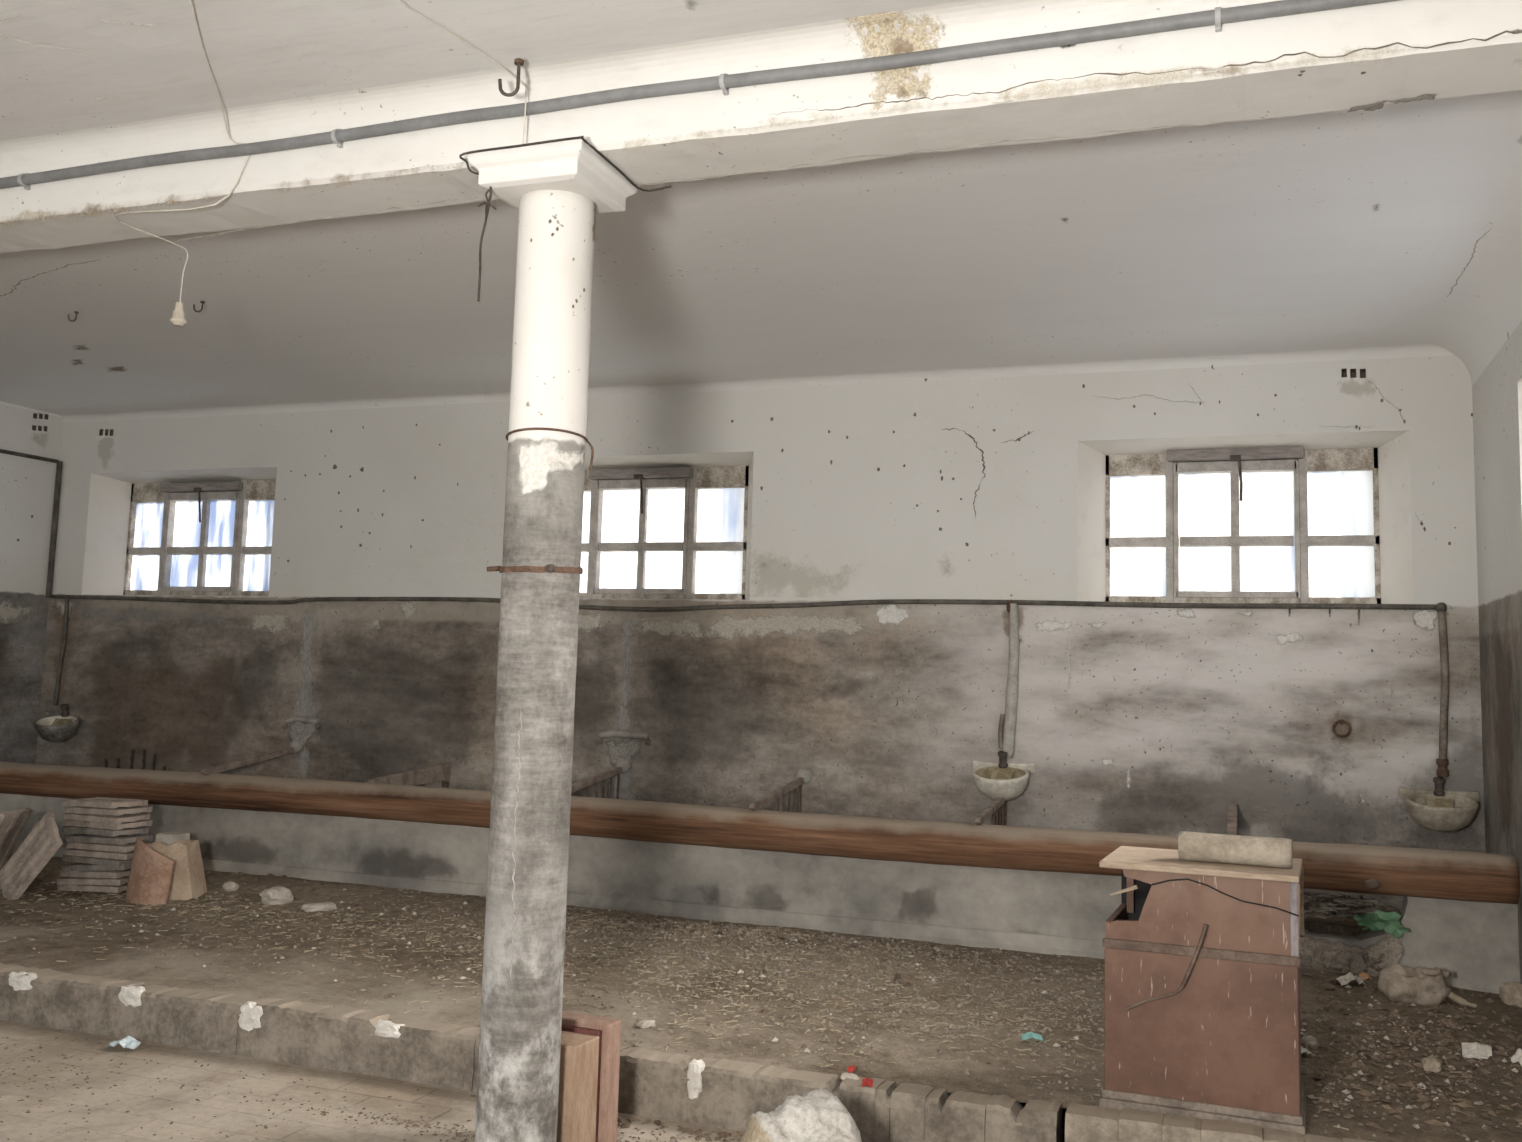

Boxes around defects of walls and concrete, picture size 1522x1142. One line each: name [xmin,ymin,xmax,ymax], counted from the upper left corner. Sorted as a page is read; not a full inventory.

peeling [847,11,944,111]
crack [771,30,1522,115]
peeling [519,438,585,494]
crack [941,428,1034,517]
peeling [578,614,604,632]
peeling [636,604,909,640]
spalling [1300,933,1404,980]